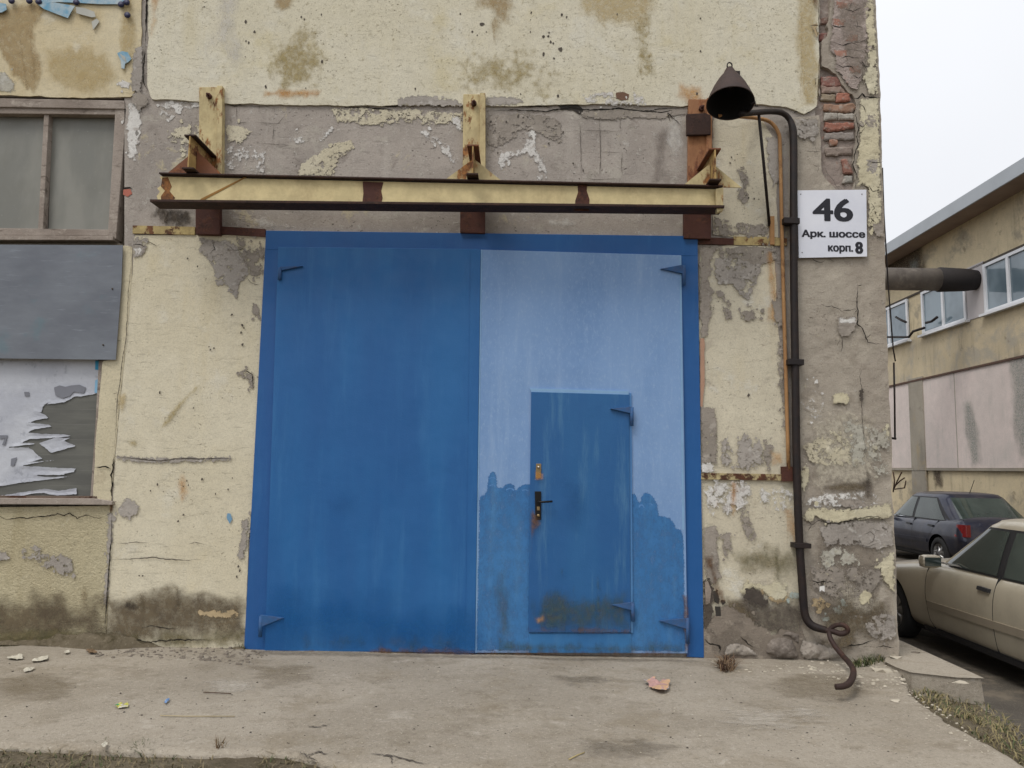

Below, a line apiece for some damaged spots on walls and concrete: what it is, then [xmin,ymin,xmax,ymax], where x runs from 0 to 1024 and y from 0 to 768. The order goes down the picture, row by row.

leakage [0,5,111,89]
peeling [297,88,463,176]
peeling [486,91,688,166]
spalling [795,0,885,238]
peeling [187,236,265,299]
crack [826,285,884,458]
crack [0,272,229,631]
spalling [699,217,806,660]
peeling [0,545,76,579]
peeling [793,430,896,615]
leakage [0,587,241,638]
peeling [865,613,896,645]